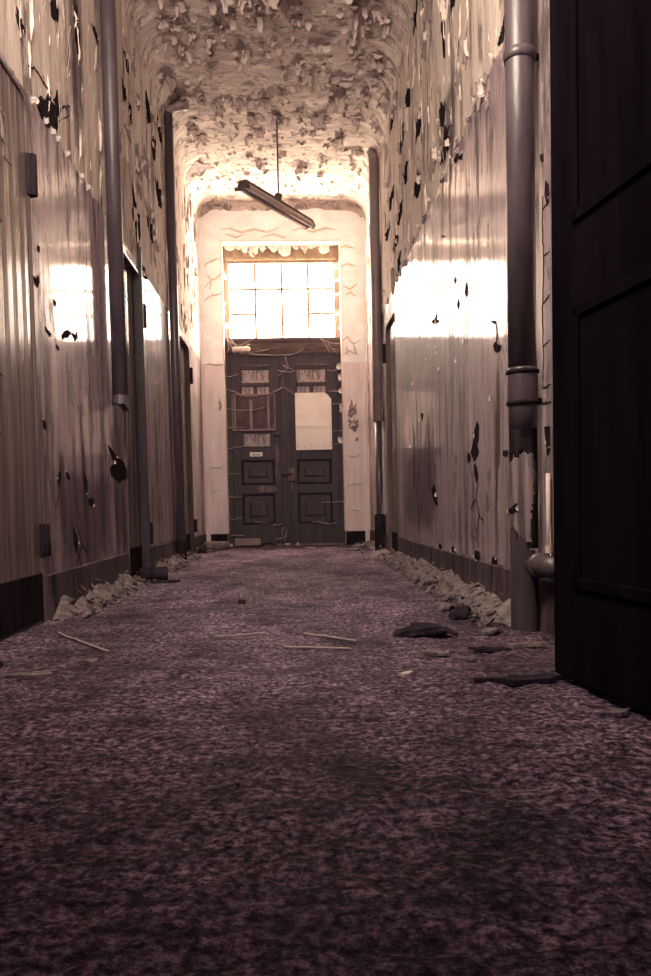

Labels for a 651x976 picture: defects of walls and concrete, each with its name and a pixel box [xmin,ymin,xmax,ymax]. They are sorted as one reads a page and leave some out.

peeling [14,0,103,203]
peeling [116,0,505,337]
flaking render [108,445,128,482]
flaking render [467,422,479,483]